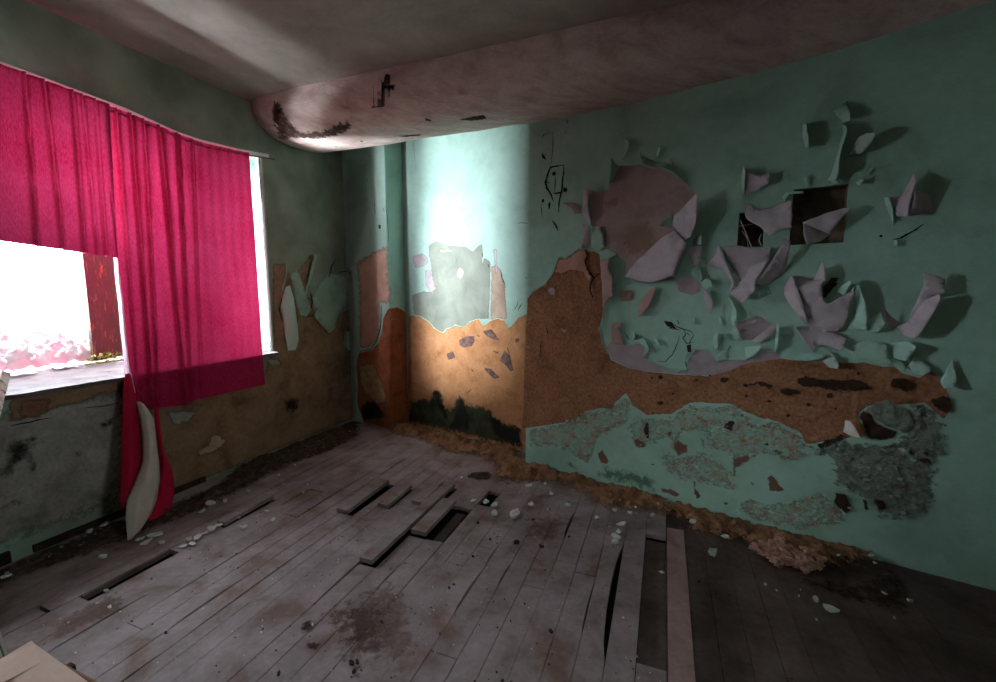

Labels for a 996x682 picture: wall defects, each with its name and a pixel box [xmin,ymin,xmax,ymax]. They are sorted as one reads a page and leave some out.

spalling [737,213,764,247]
hole [790,184,848,245]
spalling [159,241,952,531]
mould [4,438,44,474]